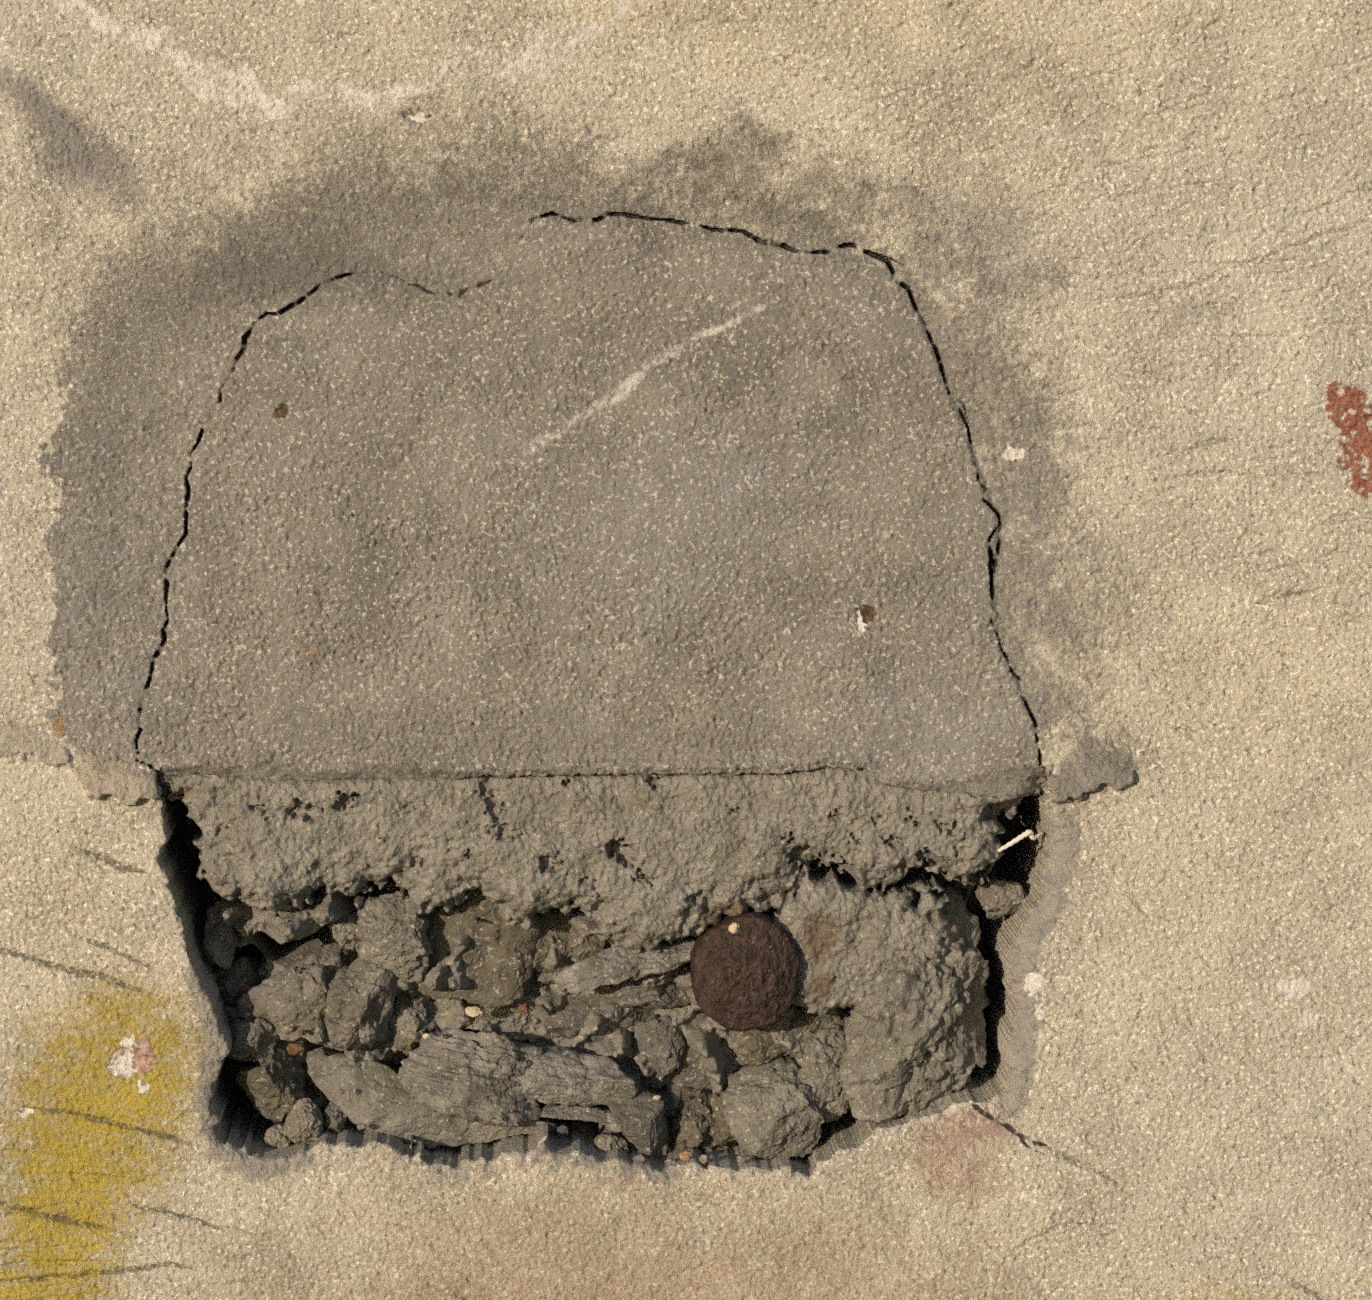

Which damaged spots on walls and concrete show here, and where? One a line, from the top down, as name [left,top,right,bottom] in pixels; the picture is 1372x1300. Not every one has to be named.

crack [136,212,1047,804]
spalling [158,760,1045,1147]
peeling [1024,971,1049,1020]